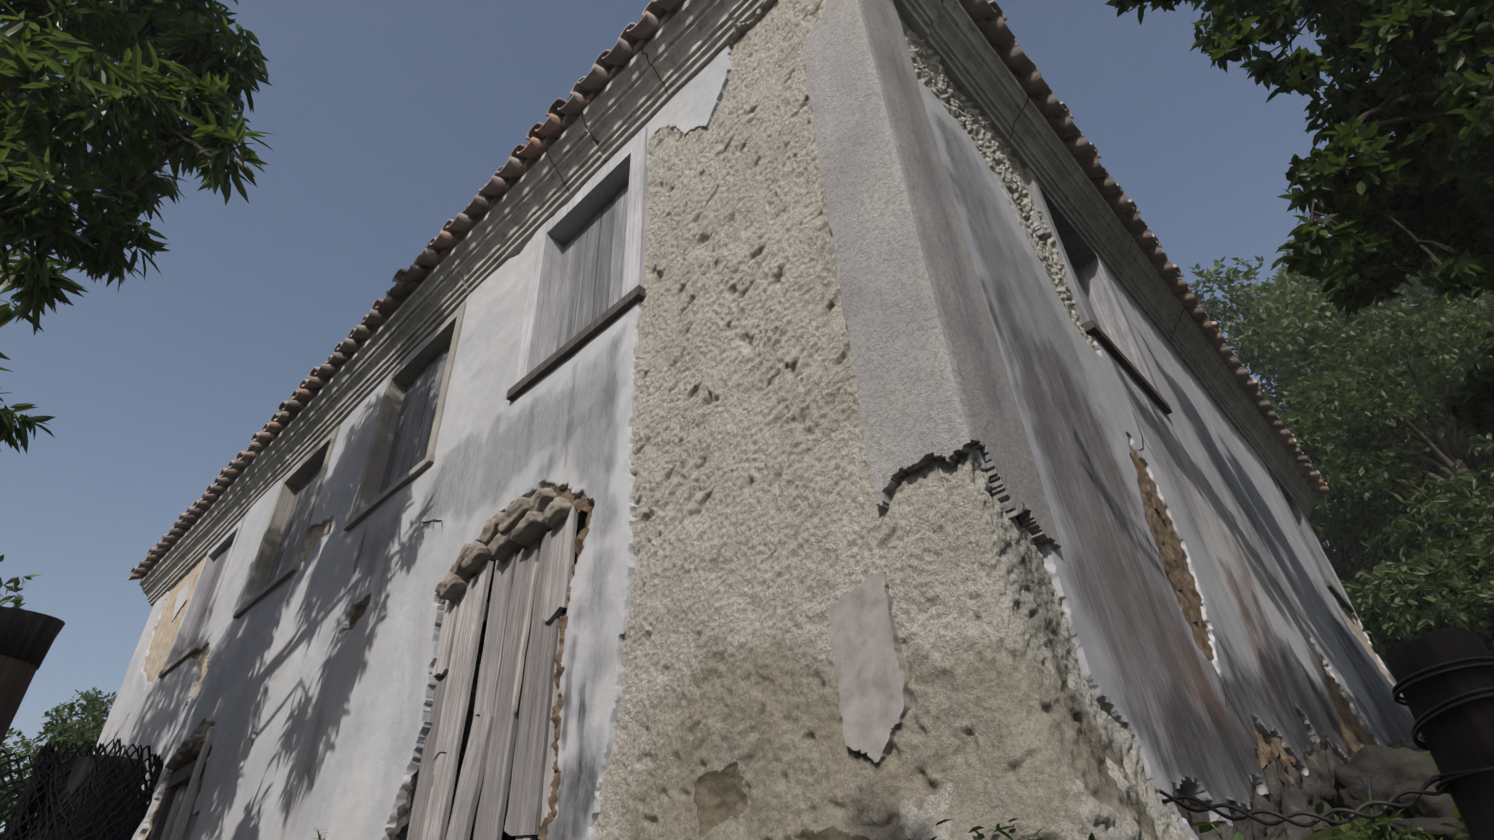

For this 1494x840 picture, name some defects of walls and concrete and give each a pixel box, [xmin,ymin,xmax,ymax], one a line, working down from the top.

peeling [143,554,207,685]
spalling [192,645,210,698]
spalling [347,597,371,630]
spalling [531,484,595,840]
spalling [593,0,1431,840]
leakage [1023,346,1350,809]